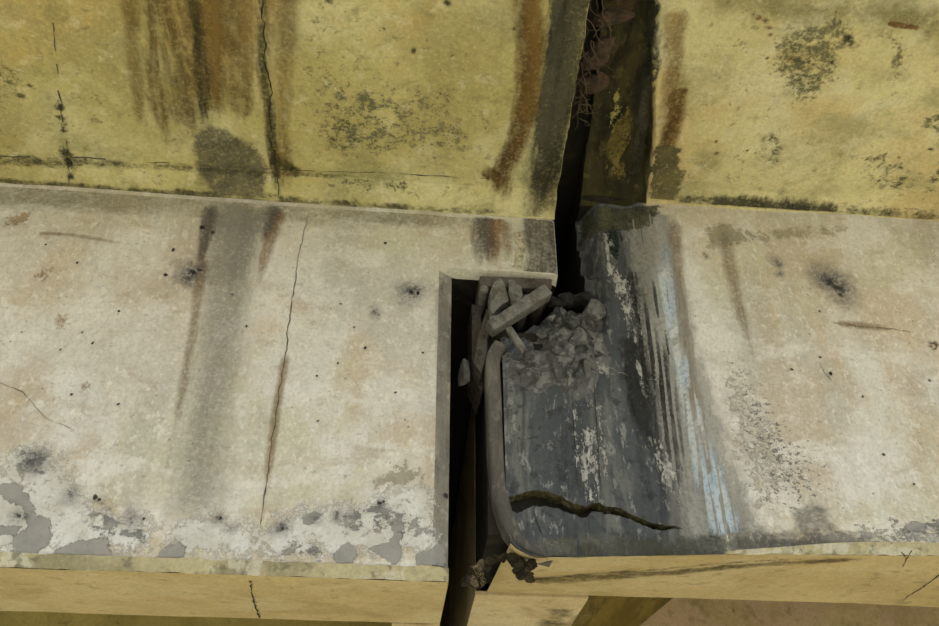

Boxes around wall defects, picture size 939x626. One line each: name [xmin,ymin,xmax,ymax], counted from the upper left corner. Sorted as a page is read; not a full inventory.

crack [0,22,124,183]
leakage [130,0,468,241]
corrosion [483,0,544,194]
corrosion [645,15,687,200]
leakage [0,179,257,448]
peeling [0,443,448,568]
crack [260,212,309,524]
spalling [505,309,615,503]
crack [509,490,740,542]
peeling [602,233,653,404]
leakage [535,205,866,583]
peeling [722,351,840,516]